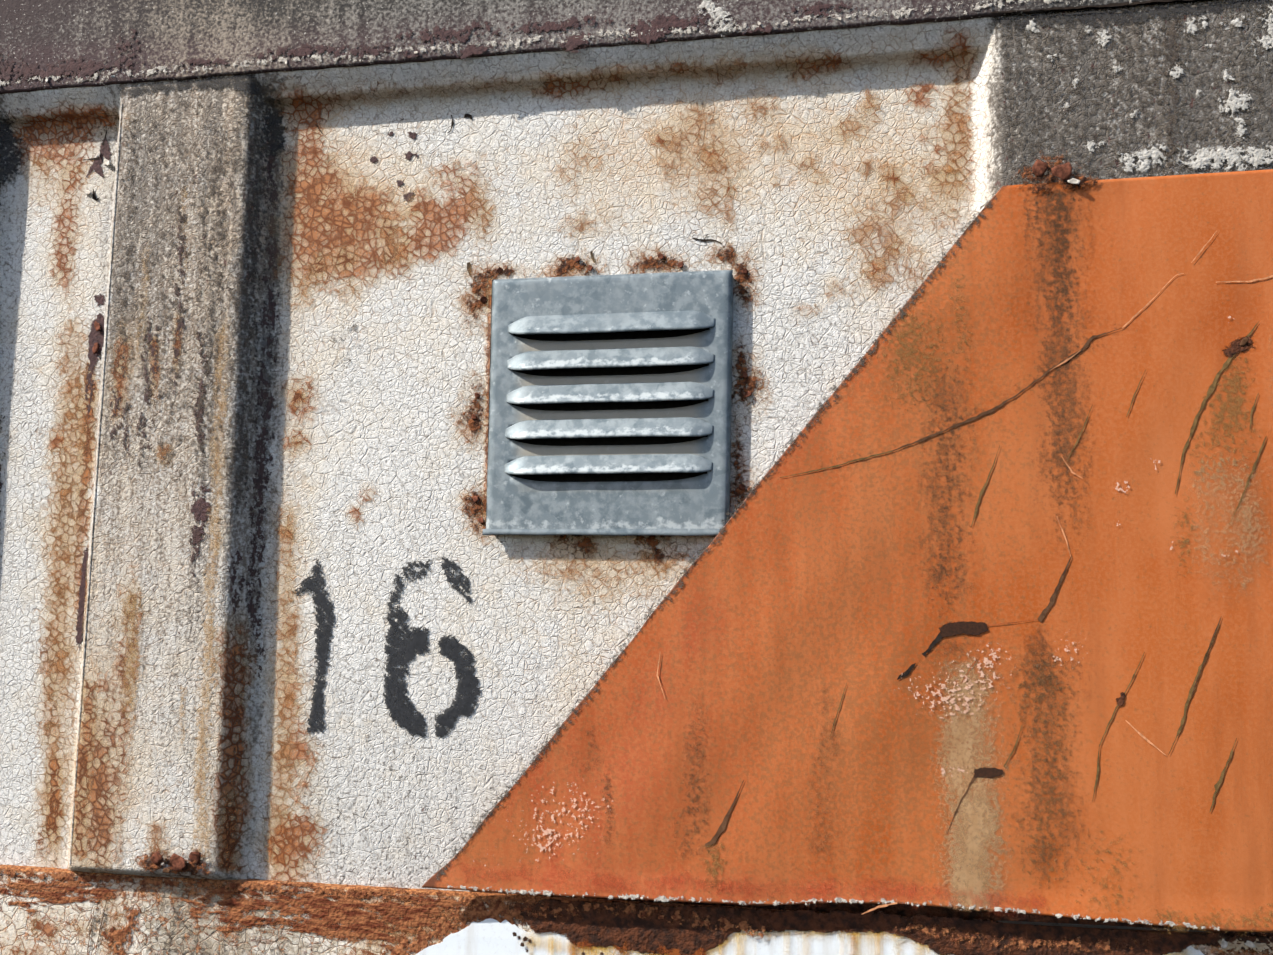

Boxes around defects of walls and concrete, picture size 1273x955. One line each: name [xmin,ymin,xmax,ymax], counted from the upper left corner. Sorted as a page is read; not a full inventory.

leakage [994,0,1273,167]
rust [12,102,120,288]
leakage [111,82,288,521]
rust [273,81,493,306]
rust [451,261,525,540]
crack [692,234,722,244]
crack [780,273,1184,478]
rust [0,315,1273,955]
peeling [436,196,997,907]
crack [897,633,942,680]
peeling [898,643,1018,719]
peeling [949,903,1273,954]